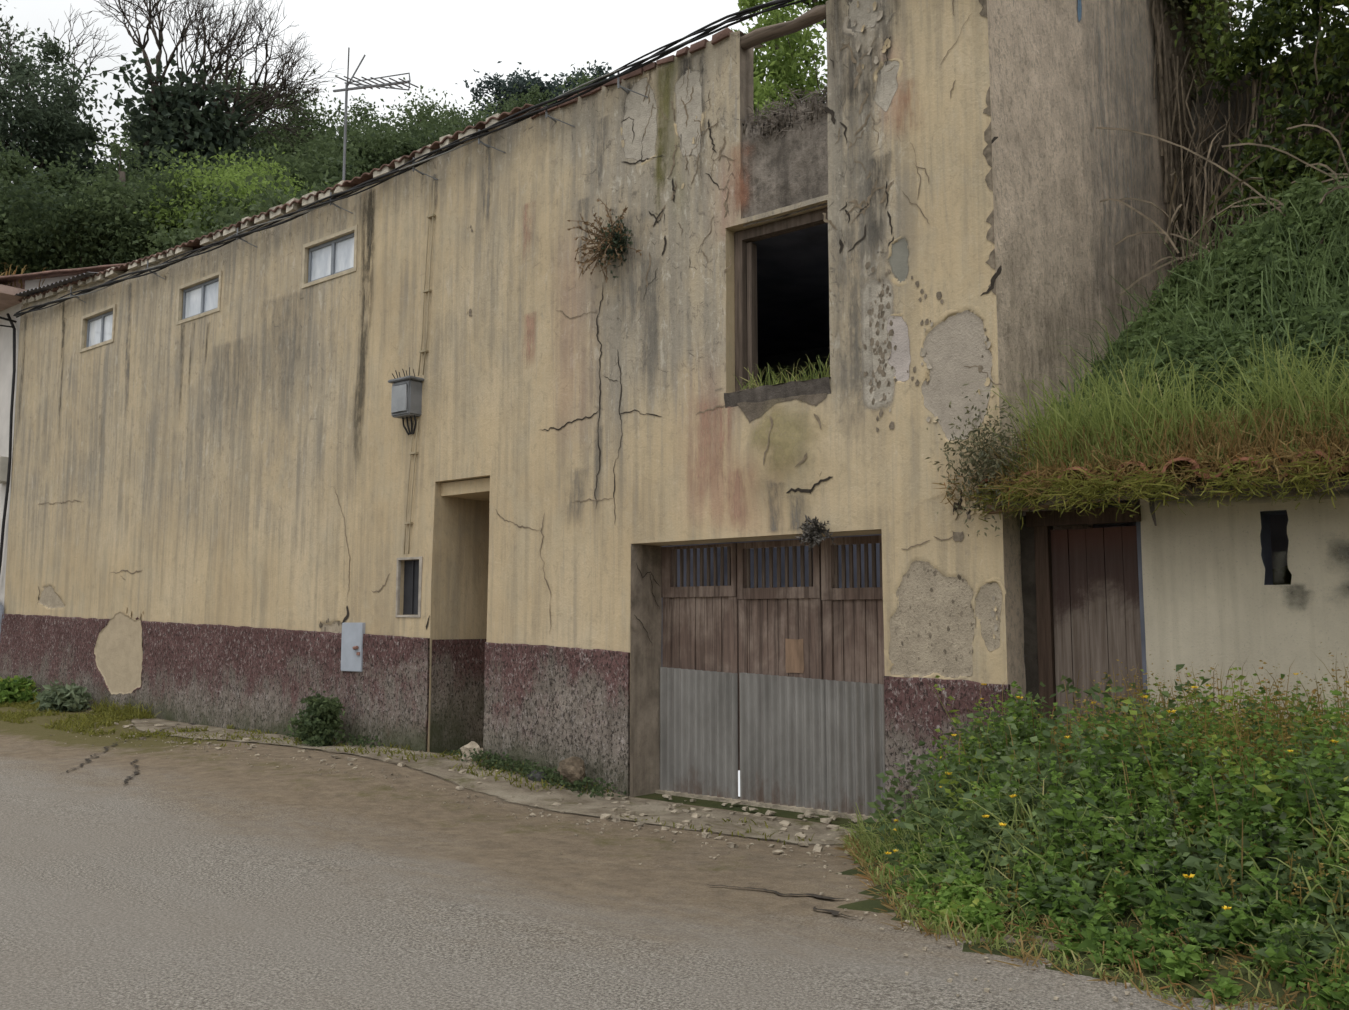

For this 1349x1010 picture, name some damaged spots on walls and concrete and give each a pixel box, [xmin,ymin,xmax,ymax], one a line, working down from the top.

spalling [979,0,987,18]
crack [621,117,663,164]
damp [659,58,703,117]
peeling [823,0,903,254]
spalling [983,87,993,191]
spalling [985,209,996,295]
damp [355,192,374,442]
spalling [861,236,996,445]
crack [496,289,662,643]
crack [786,471,832,494]
spalling [94,607,143,695]
spalling [884,561,1006,680]